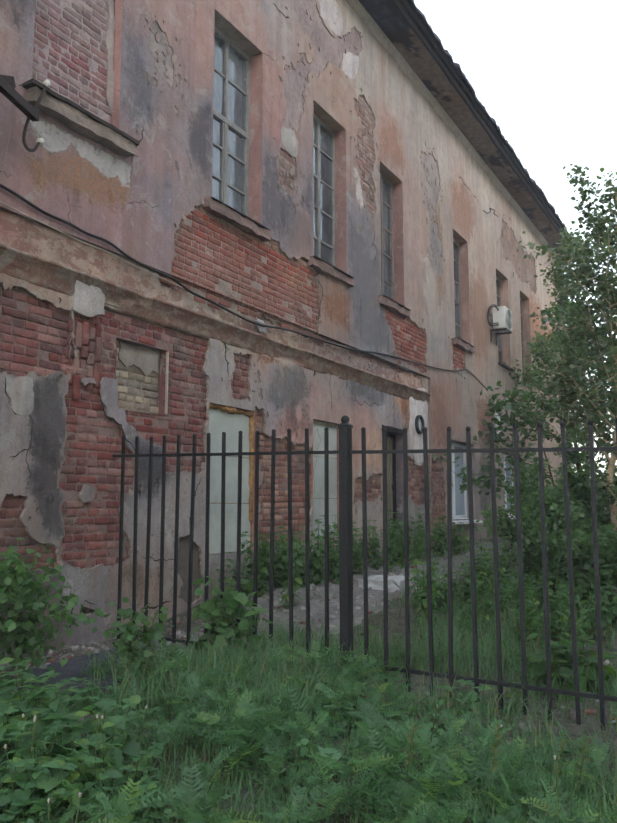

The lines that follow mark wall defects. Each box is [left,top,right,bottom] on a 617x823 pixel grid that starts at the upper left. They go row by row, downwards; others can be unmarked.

peeling [30,119,131,186]
flaking render [276,0,363,214]
flaking render [350,89,379,220]
flaking render [158,201,428,380]
water stain [30,378,65,537]
flaking render [0,277,211,572]
flaking render [221,349,321,549]
spalling [178,534,204,605]